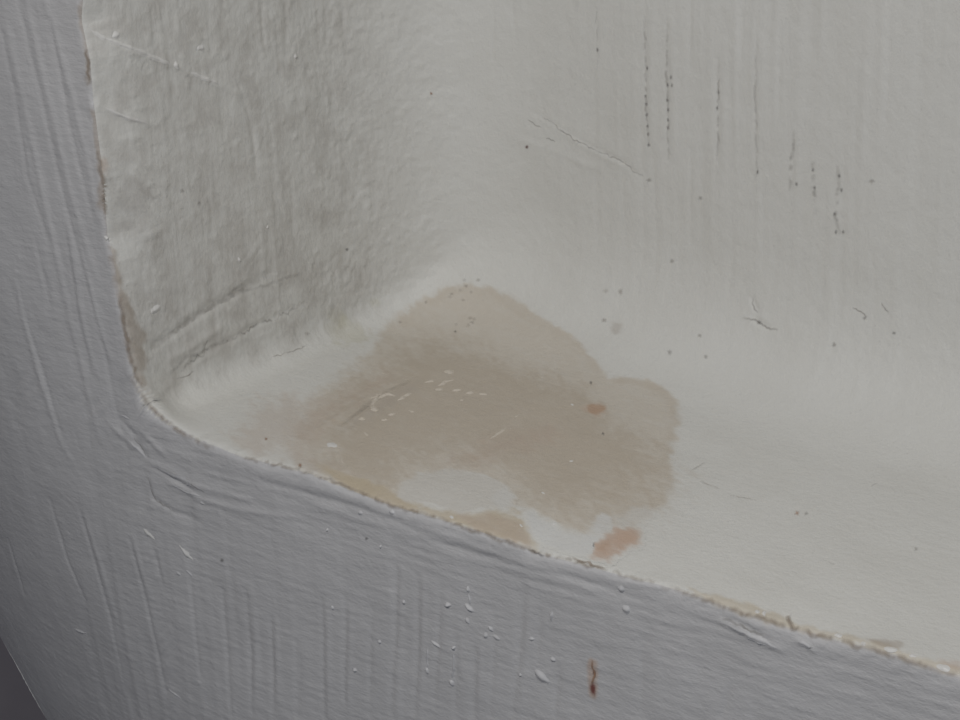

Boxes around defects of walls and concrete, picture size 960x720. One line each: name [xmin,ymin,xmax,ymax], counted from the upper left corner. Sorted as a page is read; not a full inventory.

water stain [204,278,714,556]
peeling [518,501,657,557]
corrosion [584,655,601,703]